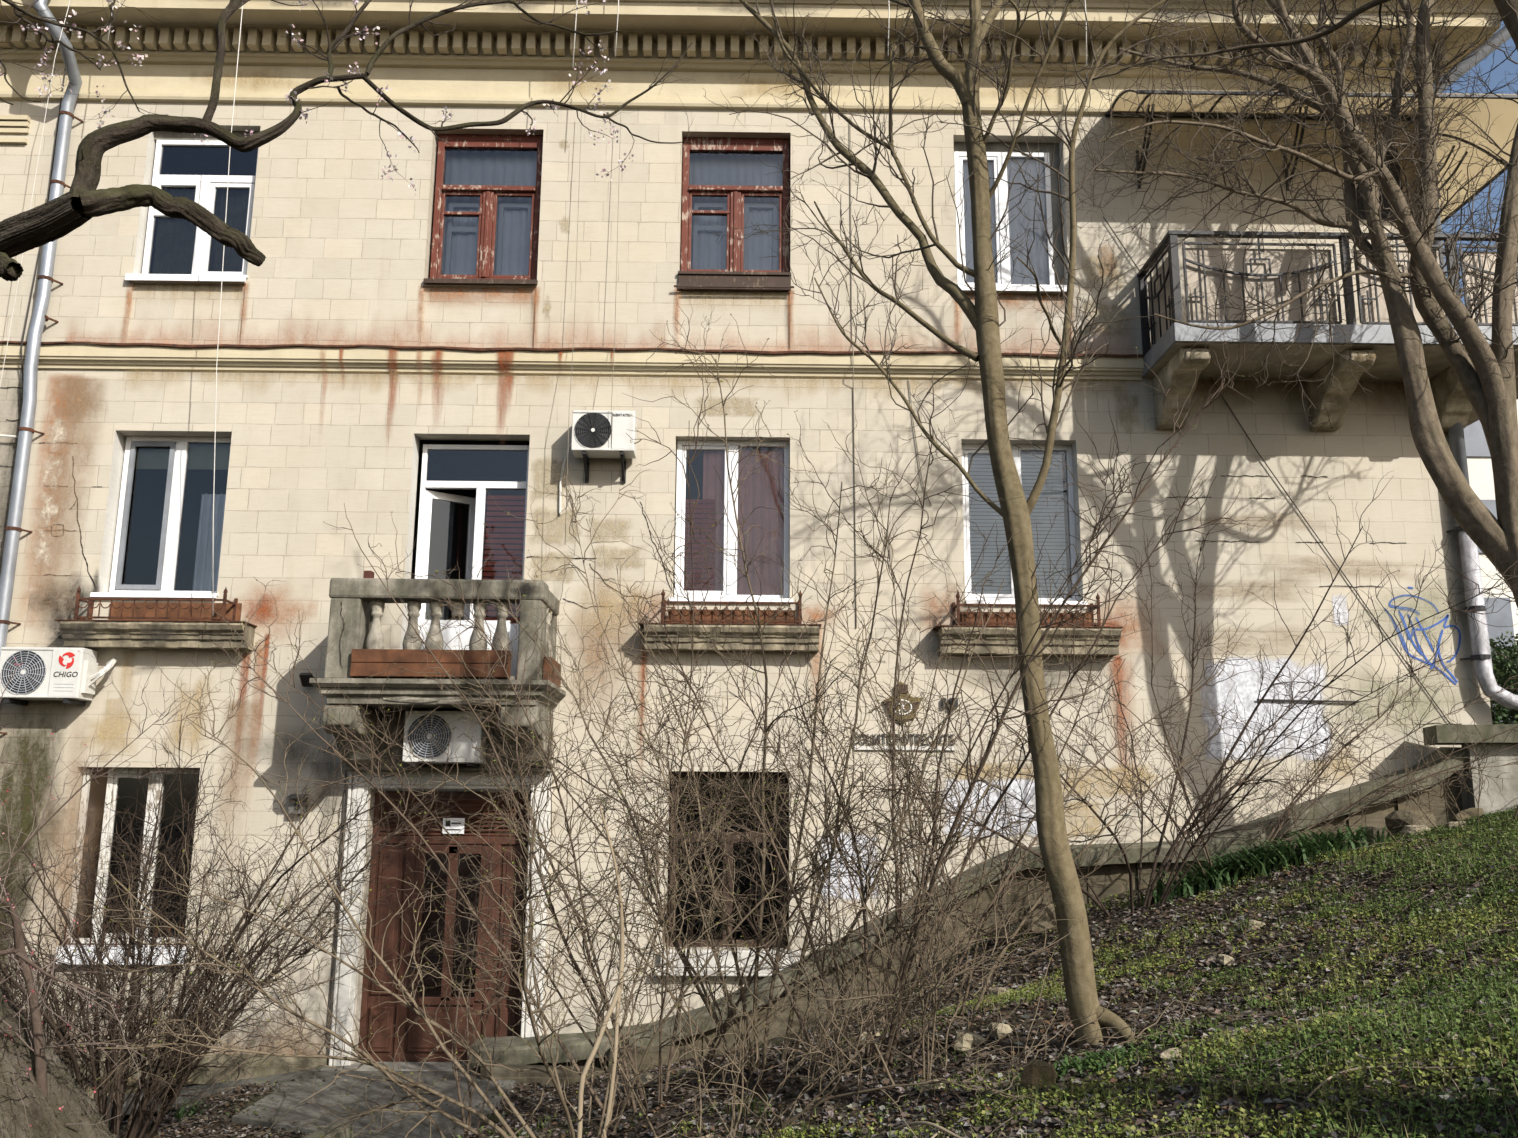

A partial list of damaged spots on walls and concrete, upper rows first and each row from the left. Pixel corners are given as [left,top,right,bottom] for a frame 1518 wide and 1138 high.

rust [998,294,1062,303]
rust [389,343,402,402]
rust [498,350,513,388]
rust [40,378,91,544]
rust [232,599,289,728]